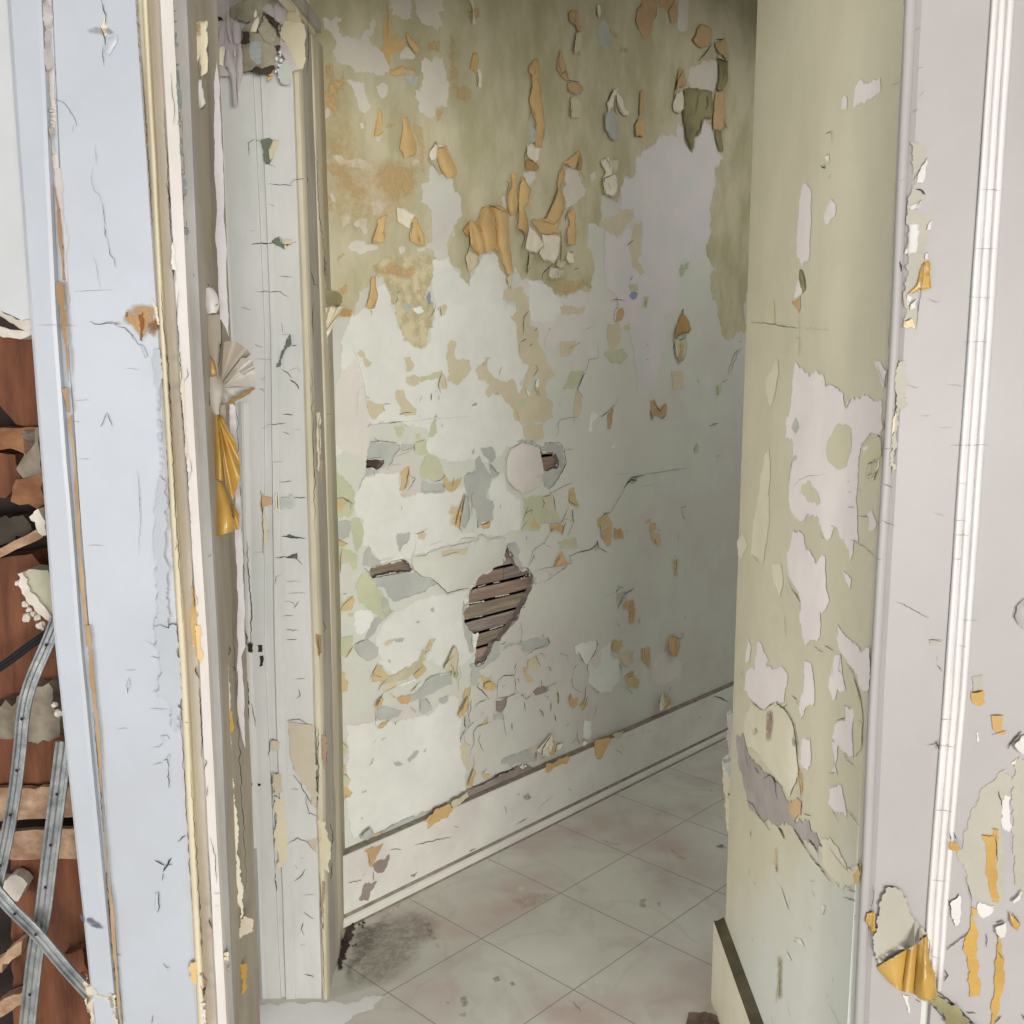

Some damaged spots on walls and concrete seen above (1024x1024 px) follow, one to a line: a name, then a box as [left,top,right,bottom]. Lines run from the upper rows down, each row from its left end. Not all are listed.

peeling [214,0,758,704]
crack [716,351,738,395]
crack [42,0,128,1024]
crack [523,423,718,583]
peeling [737,359,886,825]
peeling [228,483,254,938]
peeling [268,719,333,989]
spalling [714,696,861,901]
spalling [890,964,976,1024]
peeling [963,908,981,997]
peeling [982,828,1000,904]
peeling [990,936,1005,1024]